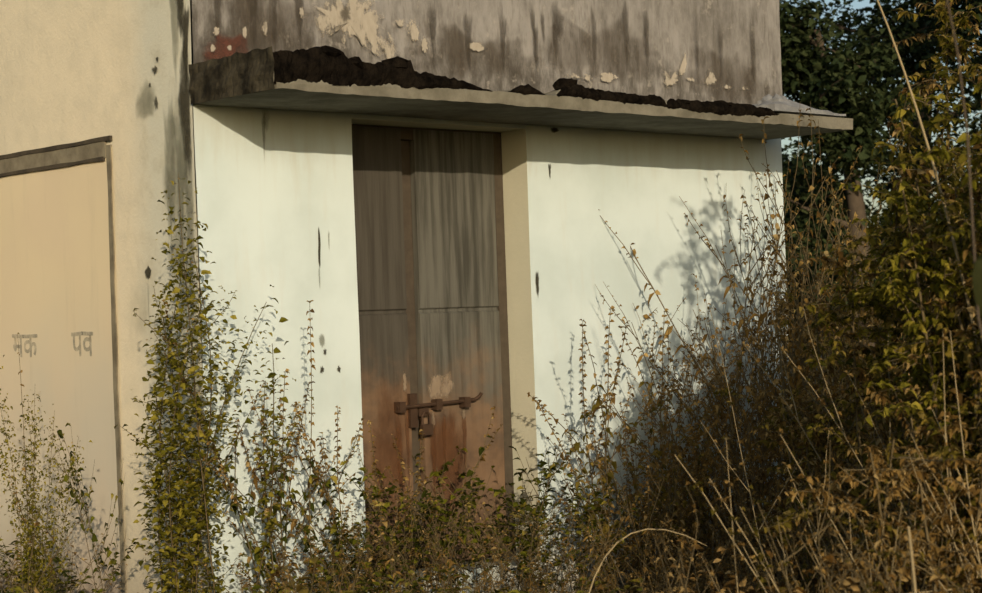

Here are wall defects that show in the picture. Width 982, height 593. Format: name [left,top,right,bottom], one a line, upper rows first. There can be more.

water stain [169,0,191,202]
spalling [188,0,492,104]
spalling [508,72,779,117]
peeling [664,54,694,86]